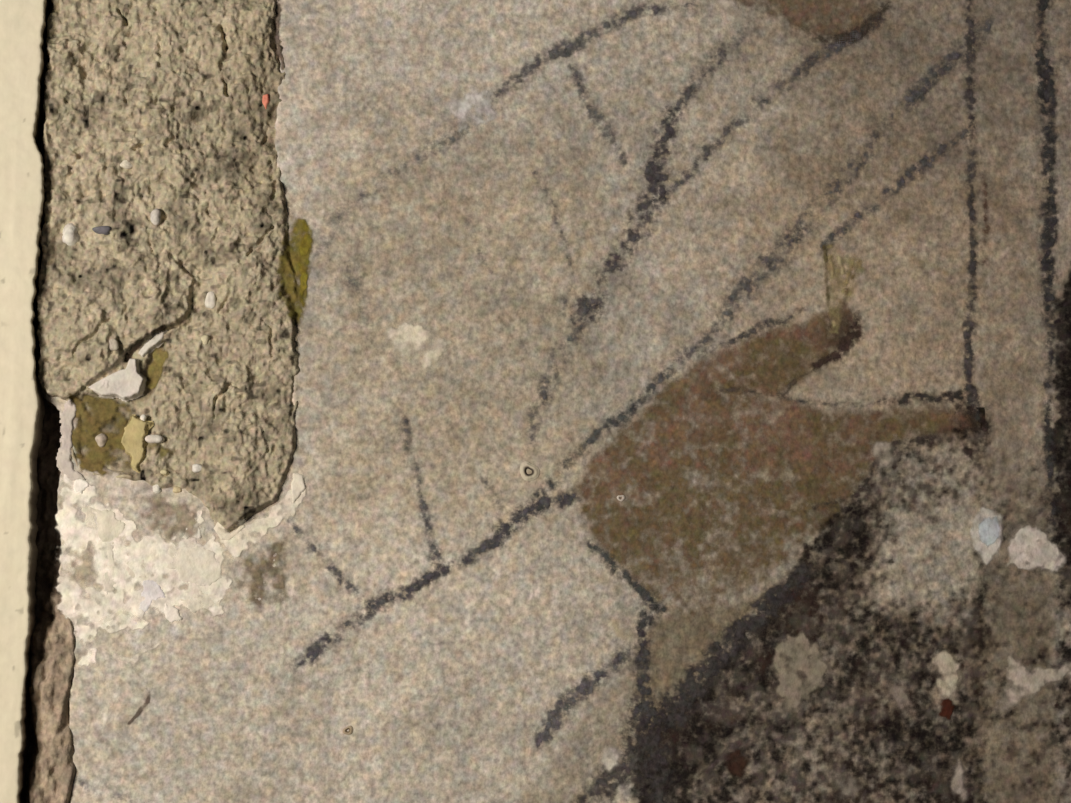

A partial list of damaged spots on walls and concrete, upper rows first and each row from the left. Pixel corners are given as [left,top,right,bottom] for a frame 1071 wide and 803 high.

crack [125,326,172,361]
flaking render [37,0,306,687]
peeling [1008,526,1065,571]